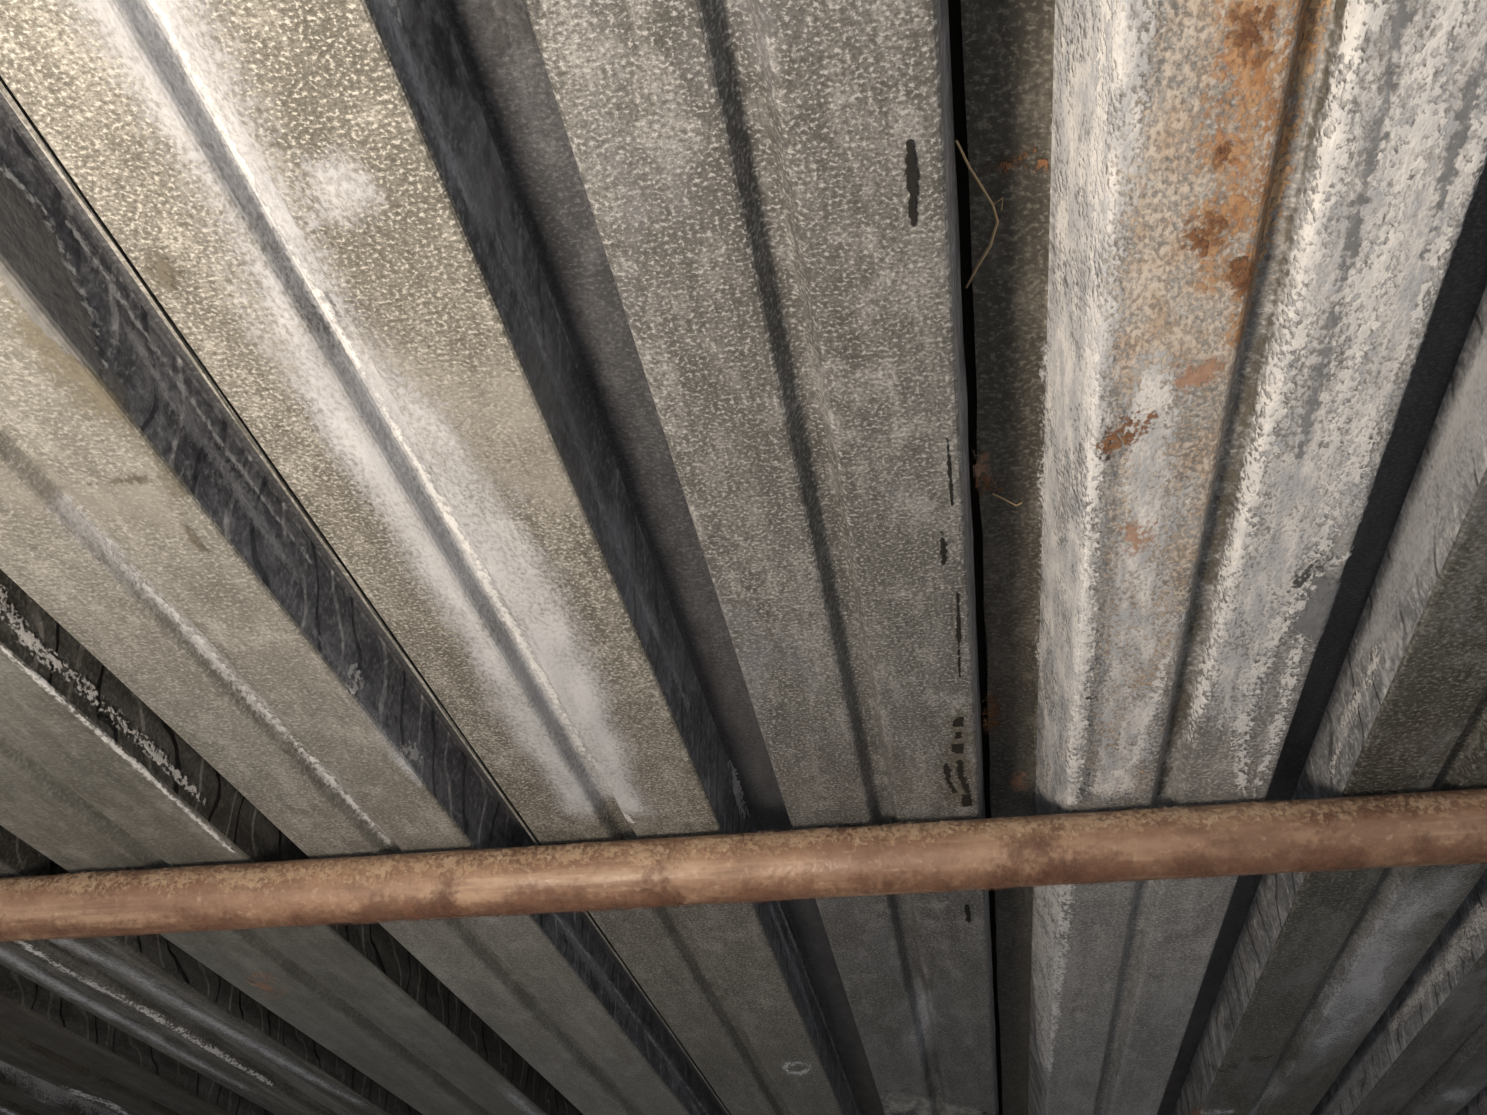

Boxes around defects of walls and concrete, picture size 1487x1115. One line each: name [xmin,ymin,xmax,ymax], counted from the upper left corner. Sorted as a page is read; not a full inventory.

corrosion [1087,0,1332,795]
water stain [1035,0,1487,808]